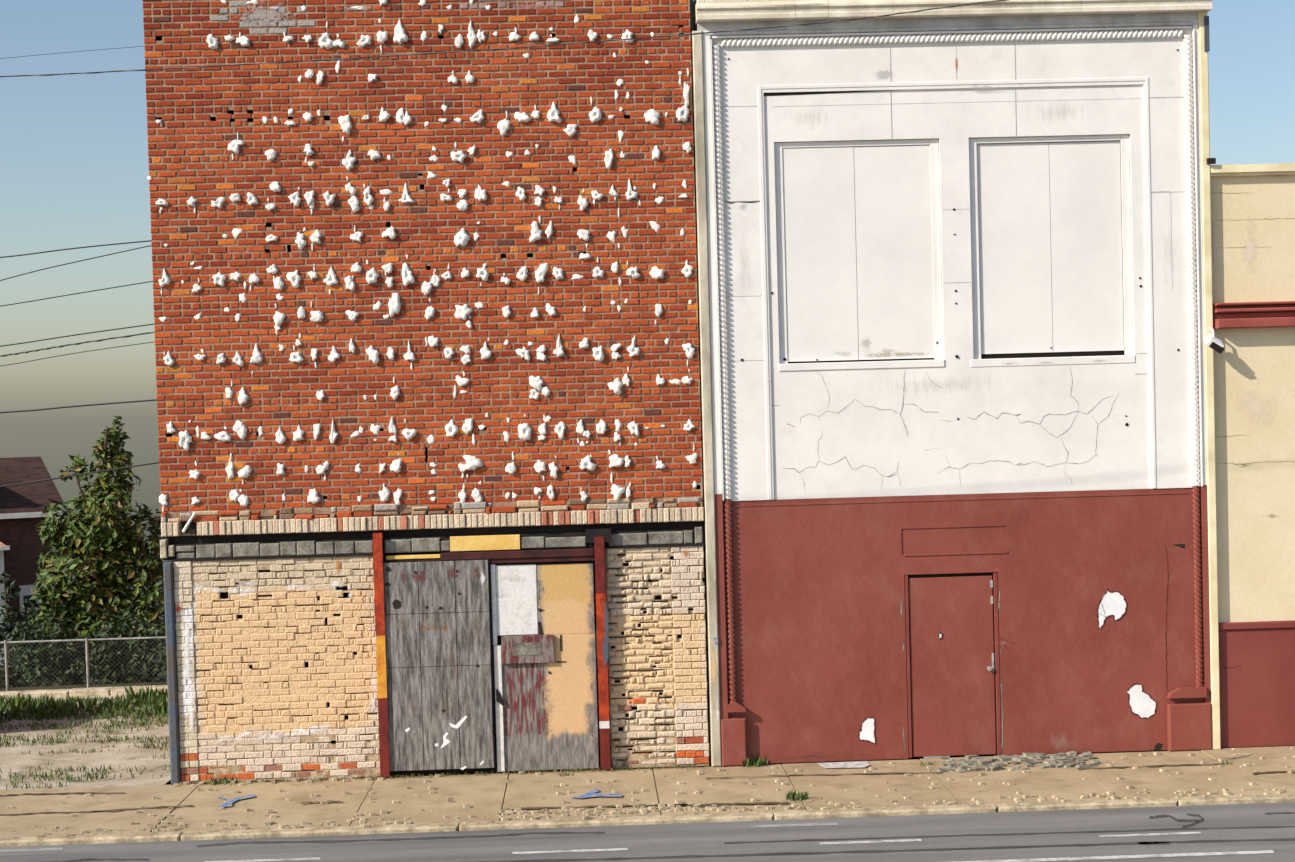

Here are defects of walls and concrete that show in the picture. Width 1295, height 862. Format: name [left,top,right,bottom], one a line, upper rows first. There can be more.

crack [785,367,1119,490]
peeling [1097,588,1127,629]
peeling [1127,683,1157,719]
peeling [859,717,876,744]